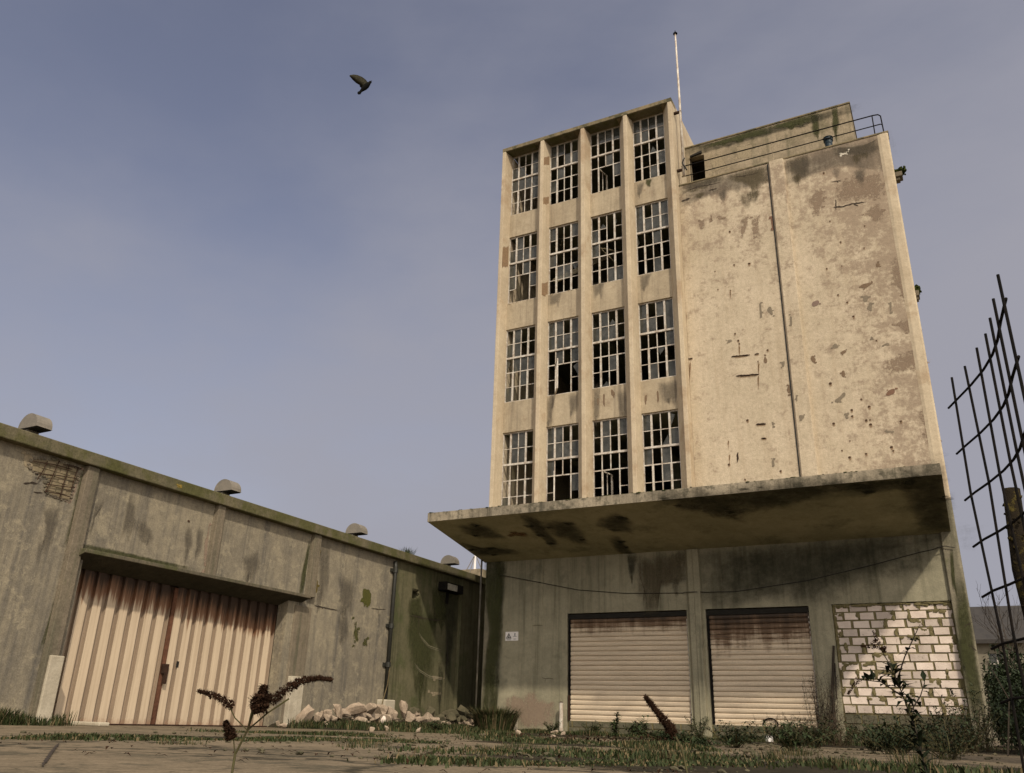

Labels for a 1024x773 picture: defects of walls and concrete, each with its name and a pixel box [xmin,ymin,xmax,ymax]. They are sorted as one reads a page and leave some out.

damp [704,109,874,162]
damp [734,168,766,203]
damp [788,158,807,182]
spalling [859,281,874,311]
peeling [876,258,910,334]
spalling [726,333,768,377]
peeling [883,351,929,372]
spalling [831,392,872,427]
spalling [21,450,84,503]
damp [661,470,951,528]
damp [606,516,685,607]
damp [409,590,455,704]